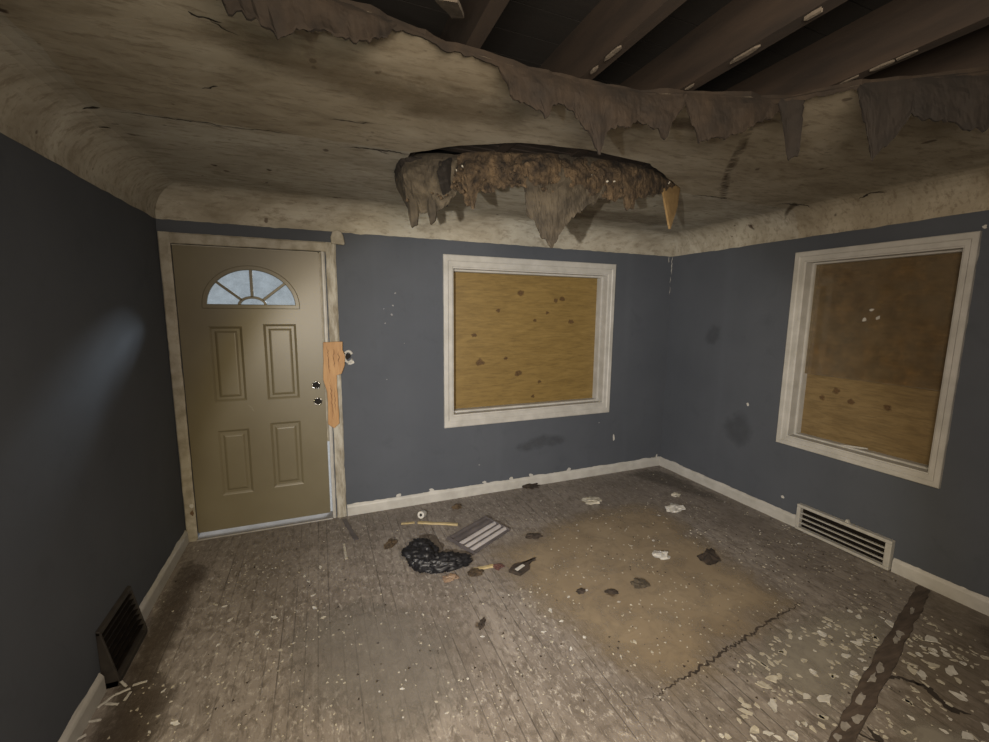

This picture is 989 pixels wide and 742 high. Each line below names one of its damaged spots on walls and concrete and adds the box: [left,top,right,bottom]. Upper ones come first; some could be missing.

spalling [386,18,518,70]